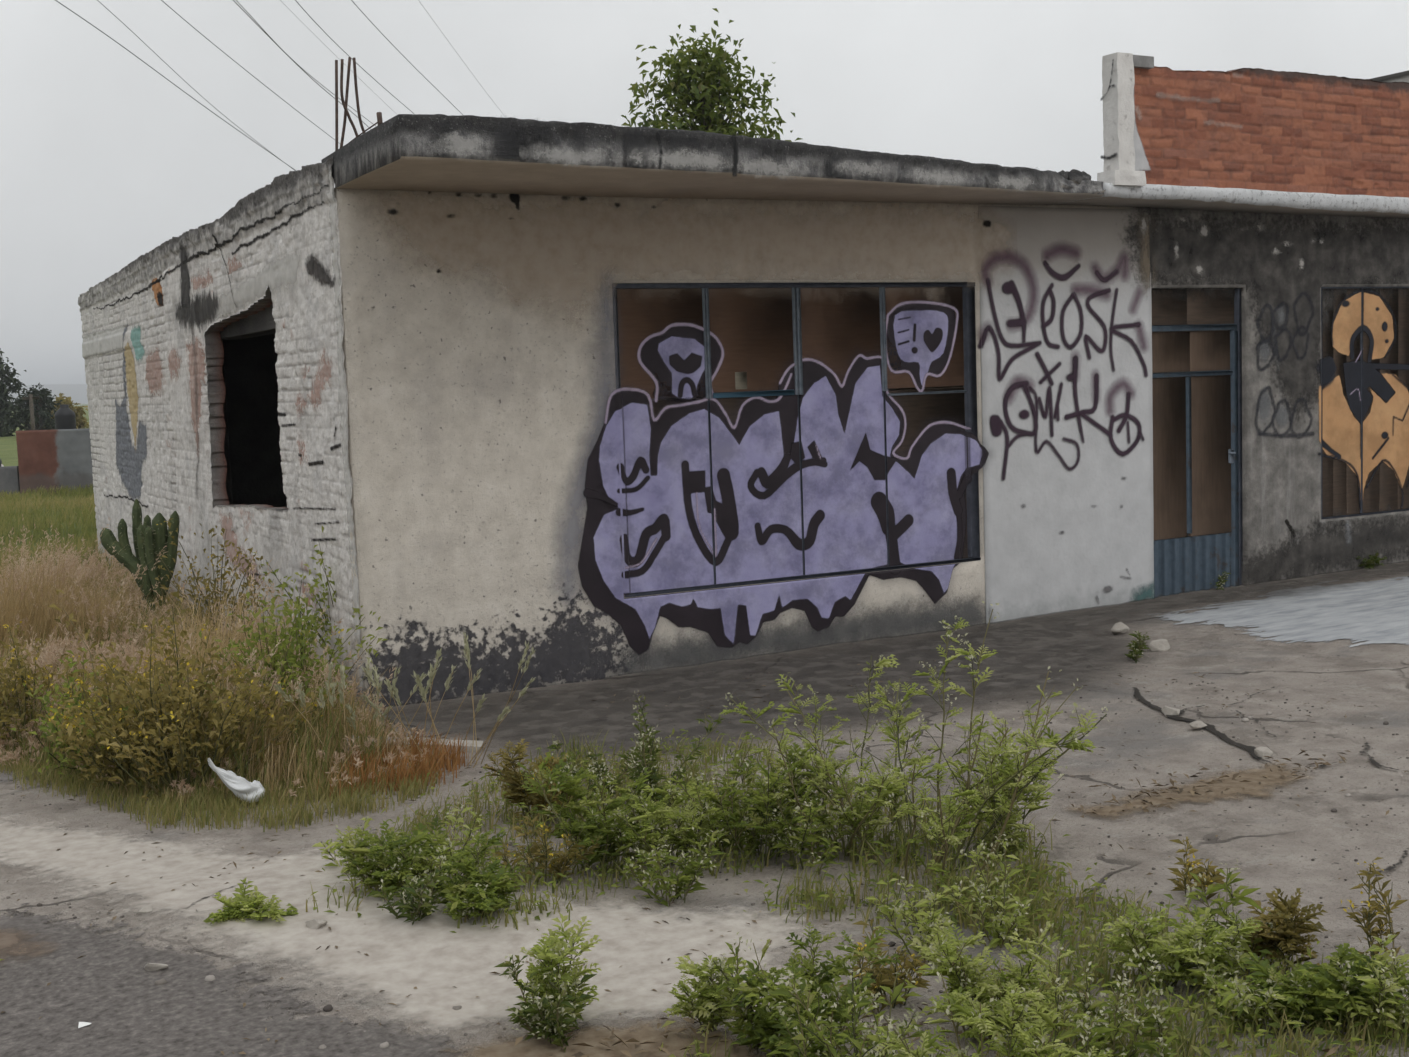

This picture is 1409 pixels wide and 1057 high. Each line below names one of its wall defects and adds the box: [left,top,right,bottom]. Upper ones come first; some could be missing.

water stain [626,134,649,167]
water stain [669,137,729,171]
water stain [826,155,874,179]
water stain [348,291,983,708]